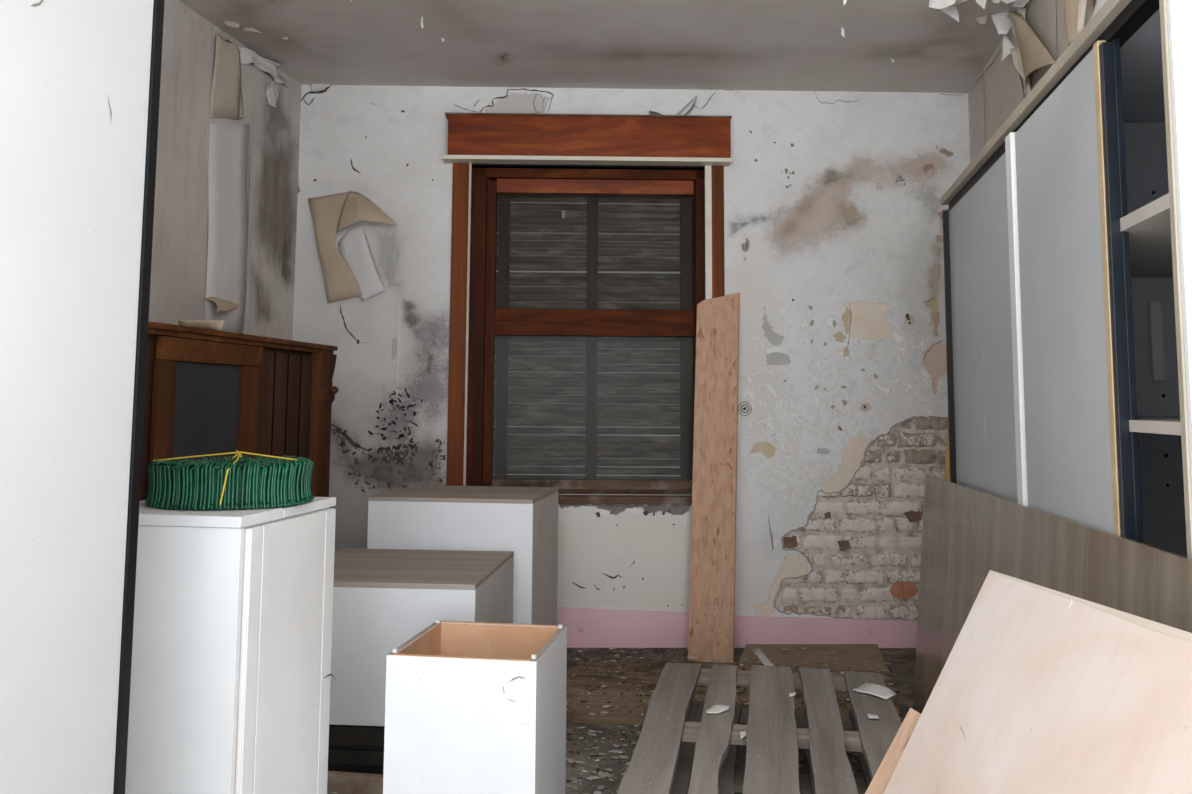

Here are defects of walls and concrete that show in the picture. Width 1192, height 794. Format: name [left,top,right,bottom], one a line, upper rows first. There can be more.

peeling [929,0,1031,94]
leakage [259,99,294,278]
spalling [762,314,790,365]
flaking render [790,296,893,357]
flaking render [921,340,947,394]
leakage [334,303,449,493]
spalling [830,386,871,412]
flaking render [751,441,776,458]
spalling [560,504,690,517]
flaking render [755,416,948,620]